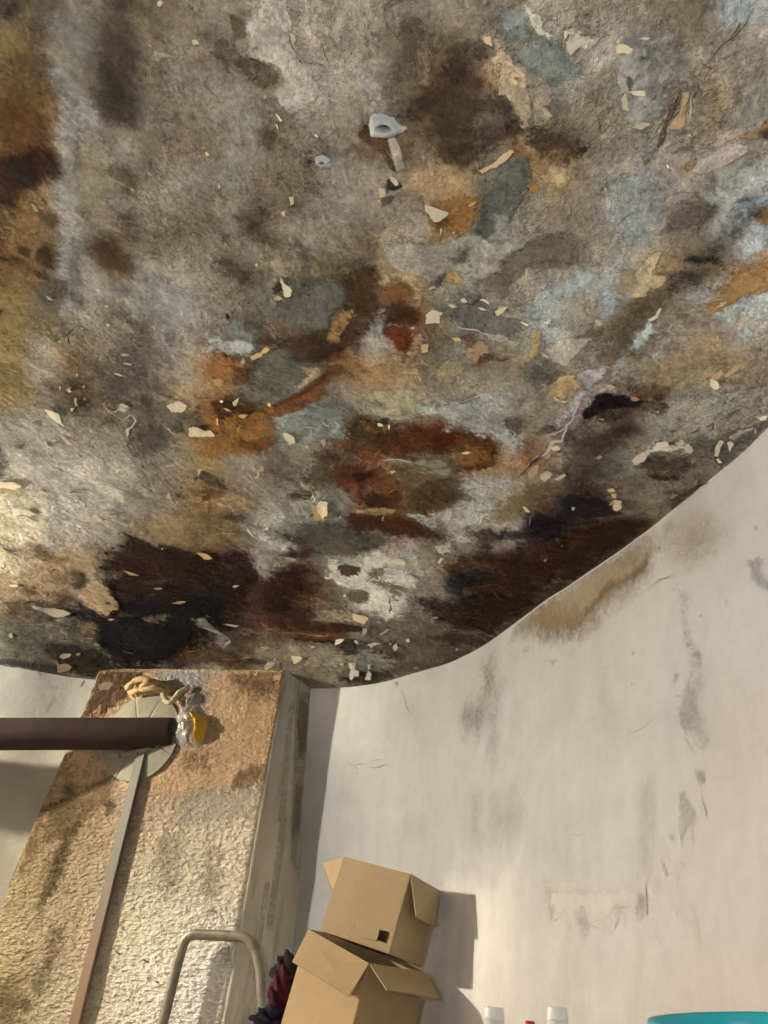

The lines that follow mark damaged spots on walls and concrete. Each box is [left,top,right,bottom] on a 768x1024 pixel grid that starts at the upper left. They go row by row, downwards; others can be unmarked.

leakage [407,40,590,165]
peeling [482,7,600,130]
peeling [245,0,407,333]
peeling [385,150,604,403]
rust [194,265,436,460]
leakage [351,190,768,544]
spalling [582,384,669,422]
peeling [632,416,768,471]
leakage [382,458,513,562]
peeling [32,579,119,646]
leakage [0,507,489,823]
leakage [524,545,649,633]